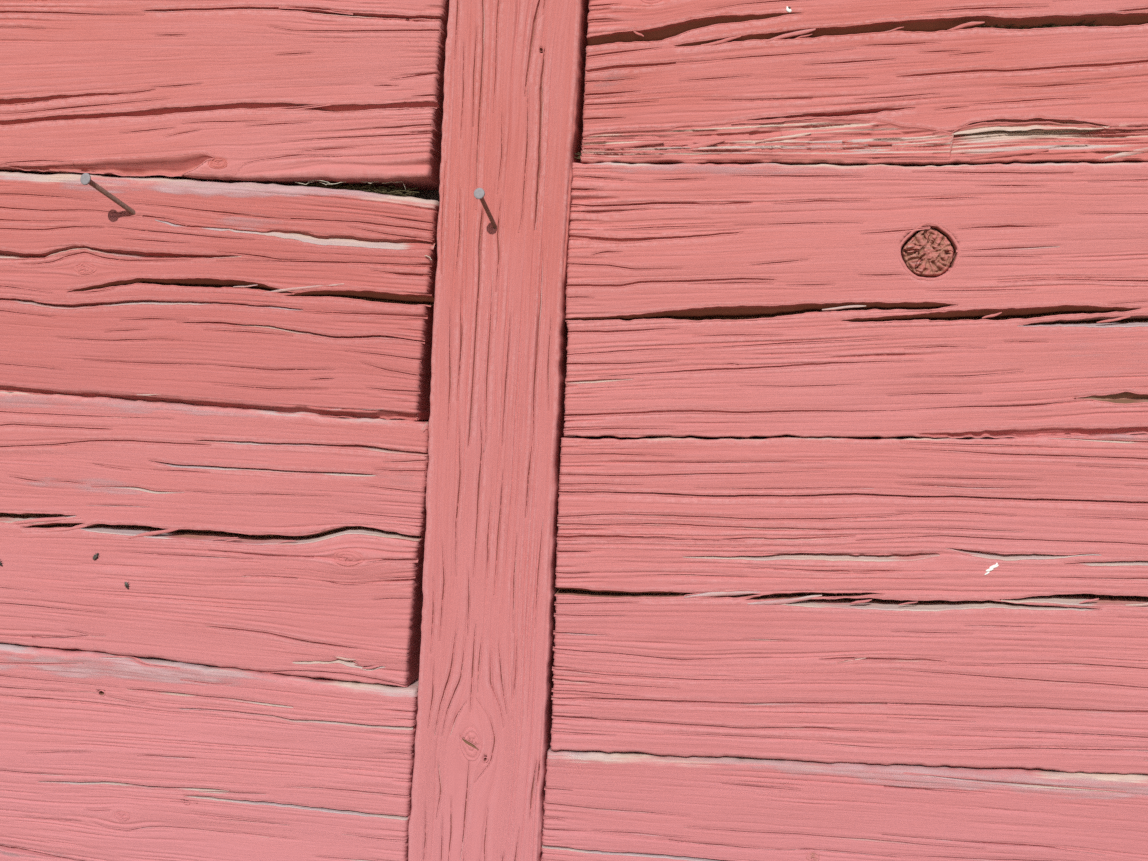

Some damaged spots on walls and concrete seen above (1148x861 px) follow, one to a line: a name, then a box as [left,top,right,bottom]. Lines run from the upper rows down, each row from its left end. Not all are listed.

crack [517,0,546,232]
crack [584,0,1148,135]
crack [0,0,518,861]
crack [525,170,1148,762]